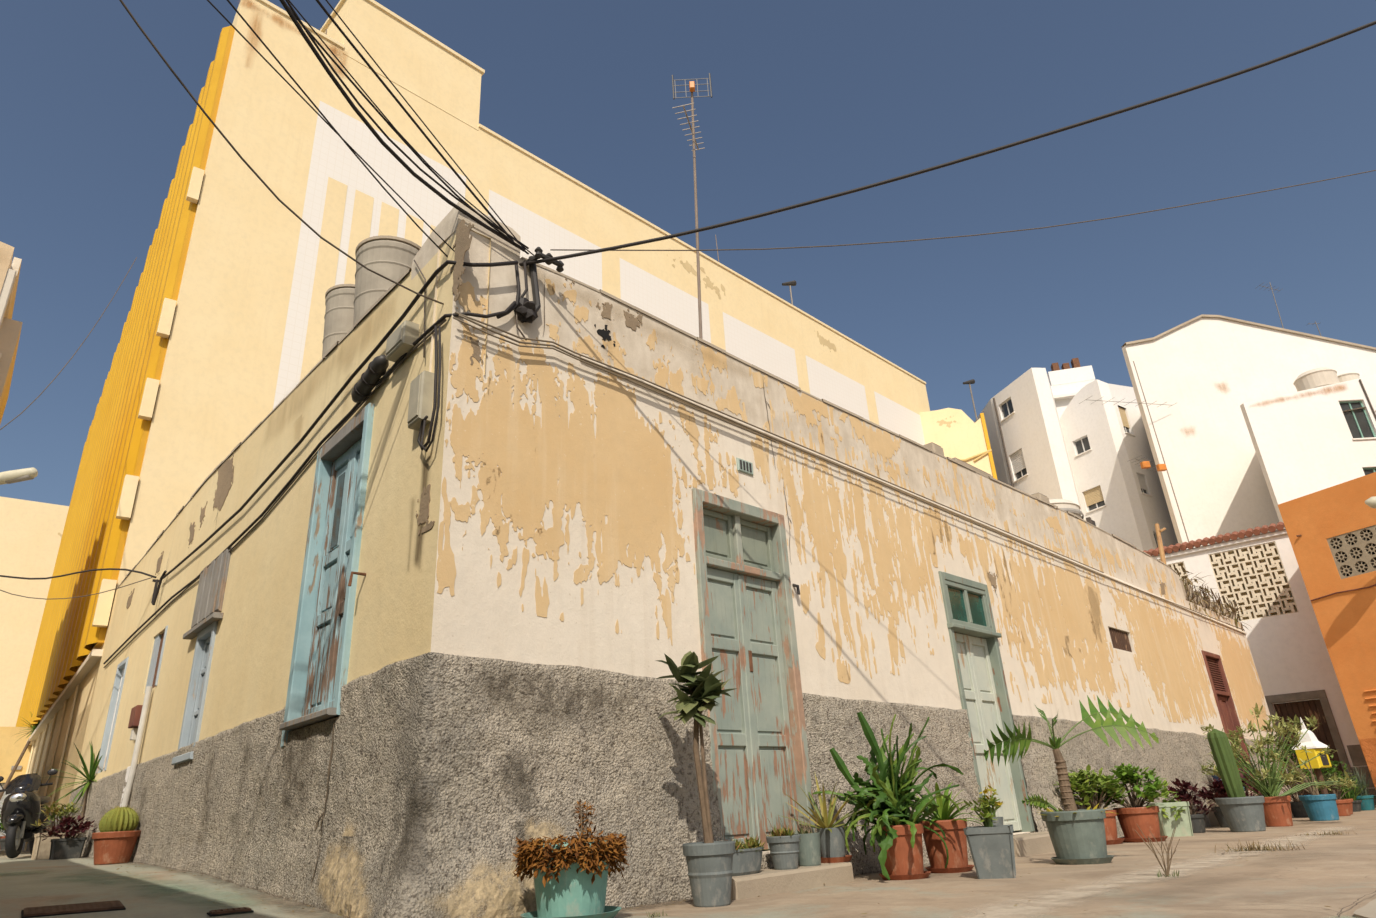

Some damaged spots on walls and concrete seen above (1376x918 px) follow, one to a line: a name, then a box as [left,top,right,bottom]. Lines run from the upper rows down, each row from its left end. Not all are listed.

flaking render [188,453,234,548]
peeling [416,219,1275,731]